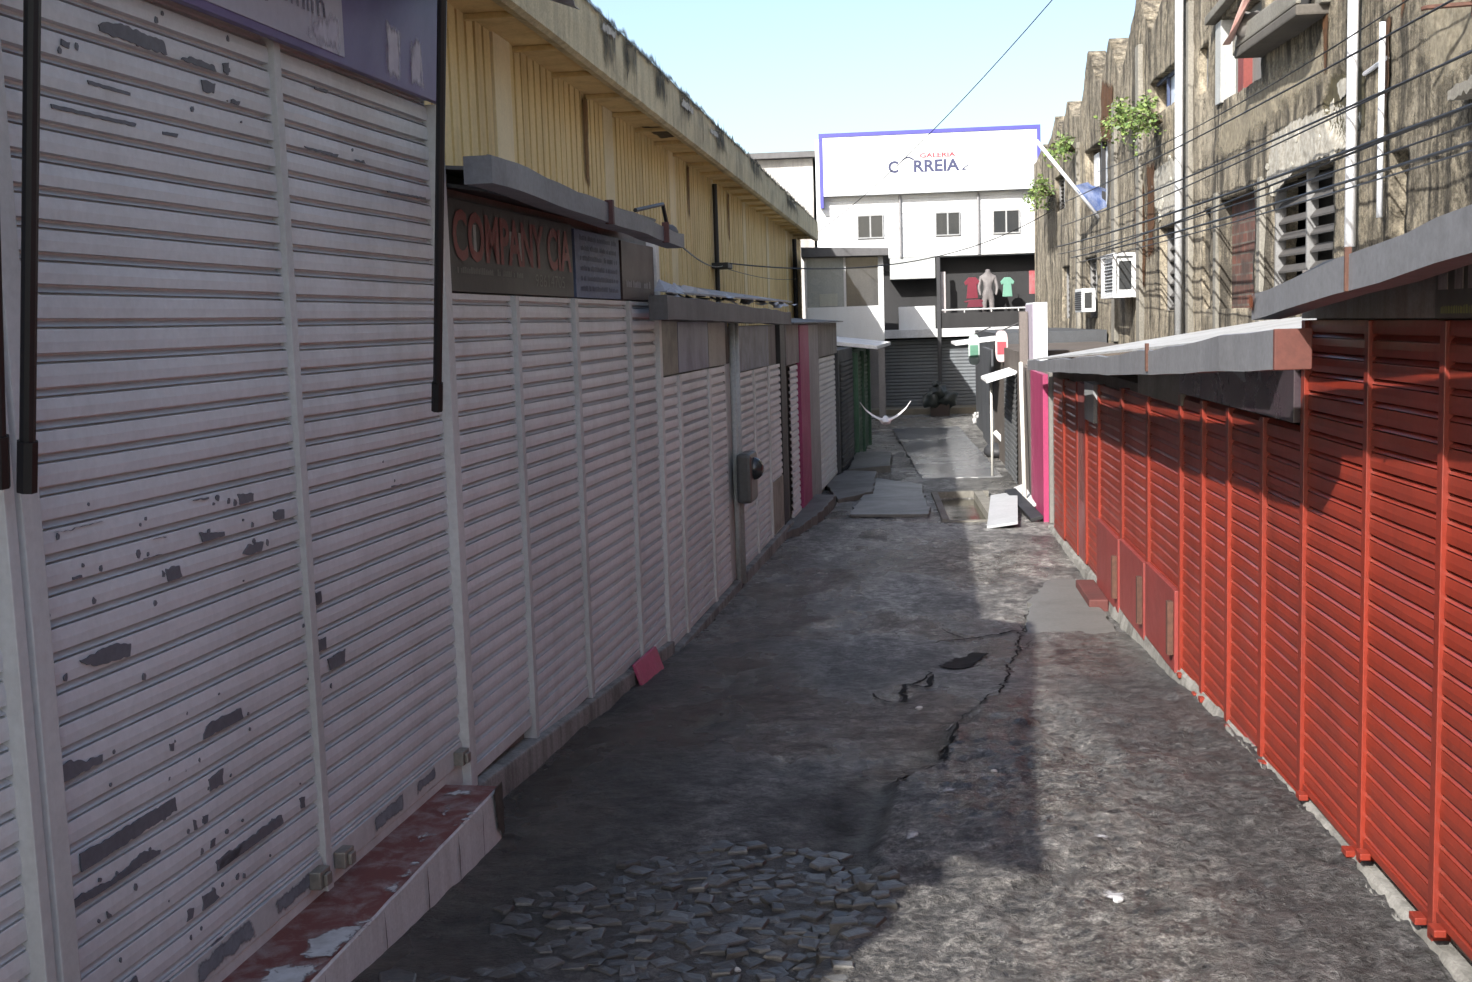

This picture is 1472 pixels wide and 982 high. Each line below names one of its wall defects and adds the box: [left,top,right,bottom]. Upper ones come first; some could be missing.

peeling [87,80,131,96]
peeling [98,11,242,123]
peeling [50,104,136,126]
peeling [193,493,269,555]
peeling [136,537,183,582]
peeling [63,643,131,681]
peeling [318,637,346,688]
peeling [203,708,251,740]
peeling [61,746,116,782]
peeling [74,758,201,908]
peeling [187,815,284,947]
peeling [261,920,371,982]